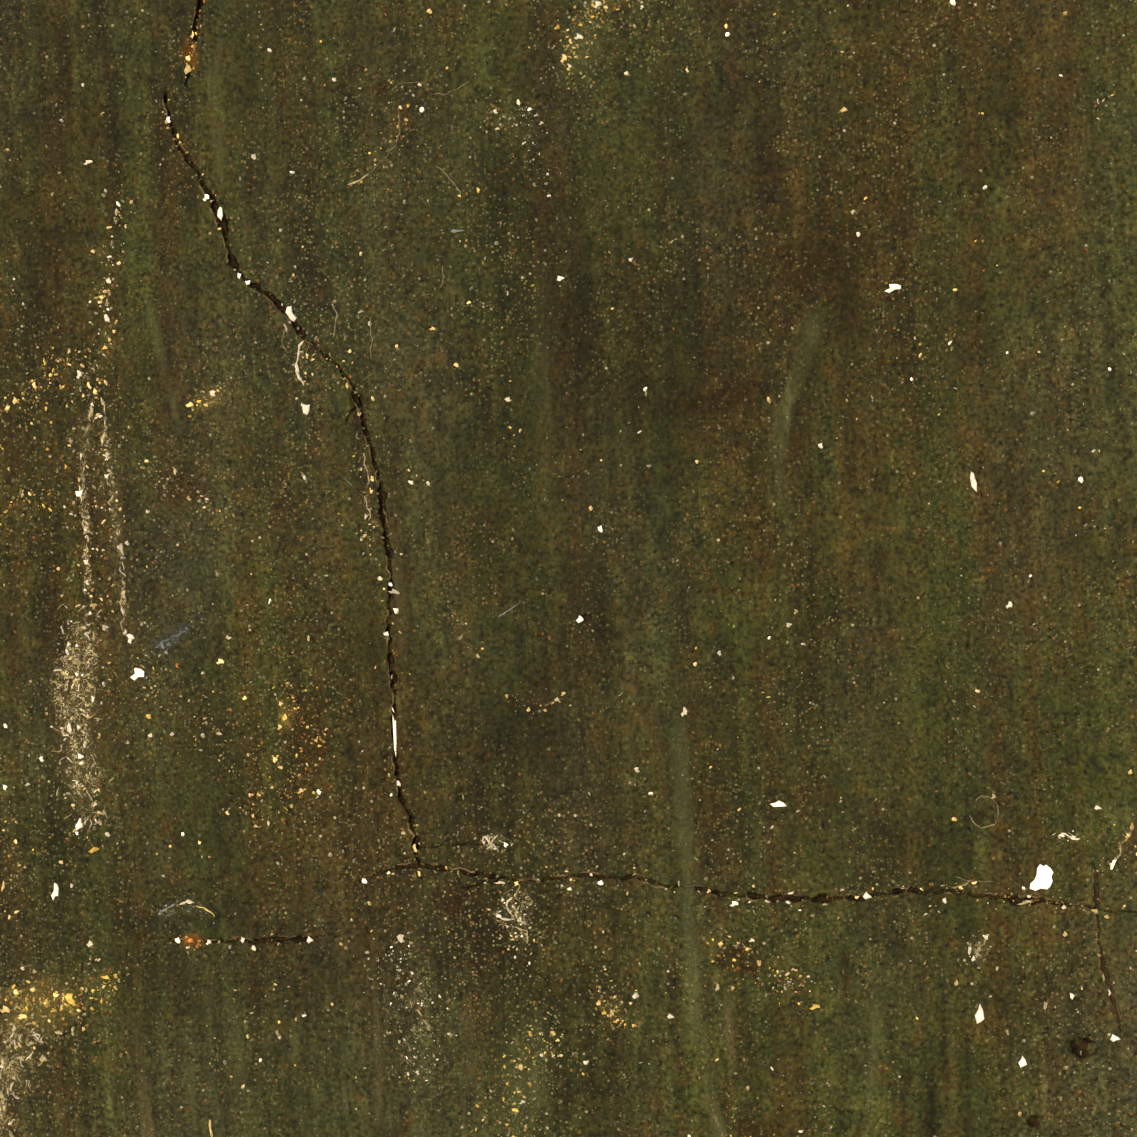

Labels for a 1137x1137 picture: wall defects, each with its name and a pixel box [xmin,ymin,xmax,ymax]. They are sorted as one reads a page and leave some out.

crack [160,0,1137,1040]